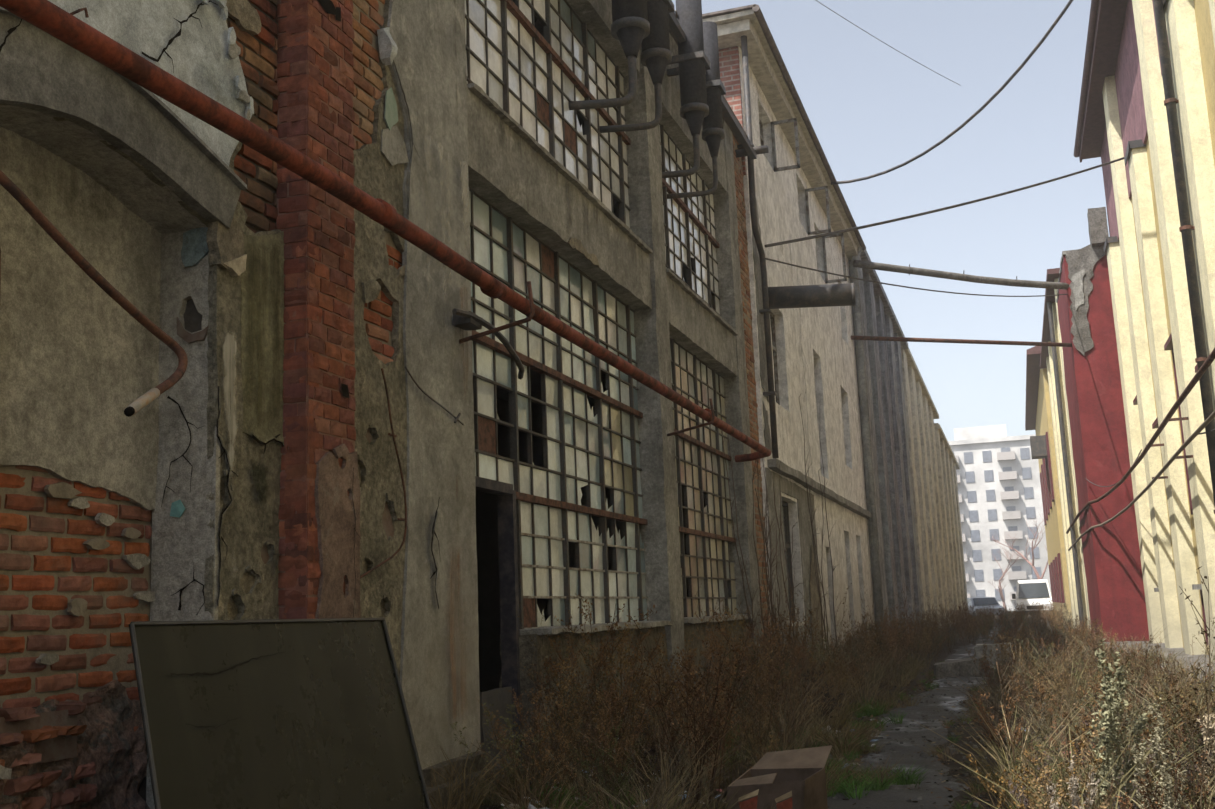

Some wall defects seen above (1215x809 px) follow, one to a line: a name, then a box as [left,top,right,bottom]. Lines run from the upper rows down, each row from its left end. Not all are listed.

crack [0,19,22,52]
crack [142,0,218,73]
spalling [200,0,279,139]
spalling [181,144,278,277]
spalling [177,299,209,344]
spalling [361,279,394,364]
spalling [0,465,155,709]
crack [161,386,285,615]
flaking render [314,444,361,619]